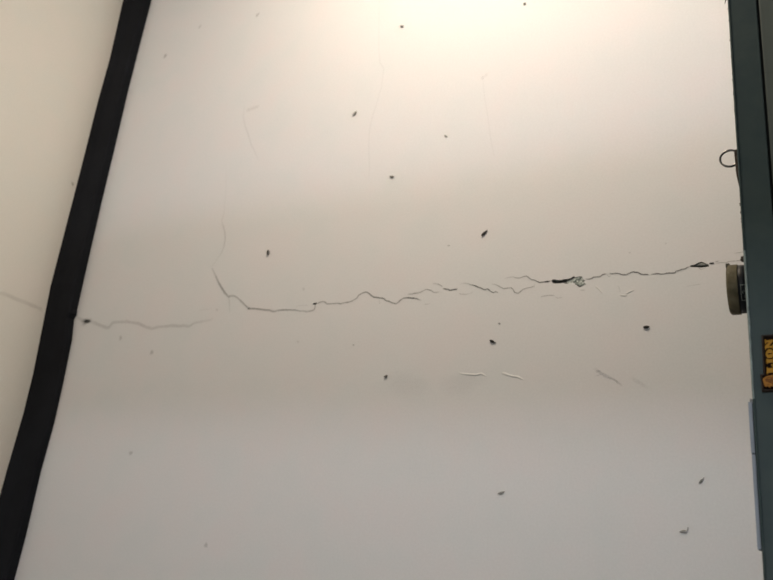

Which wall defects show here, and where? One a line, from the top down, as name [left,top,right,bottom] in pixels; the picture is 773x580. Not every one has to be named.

crack [590,267,688,279]